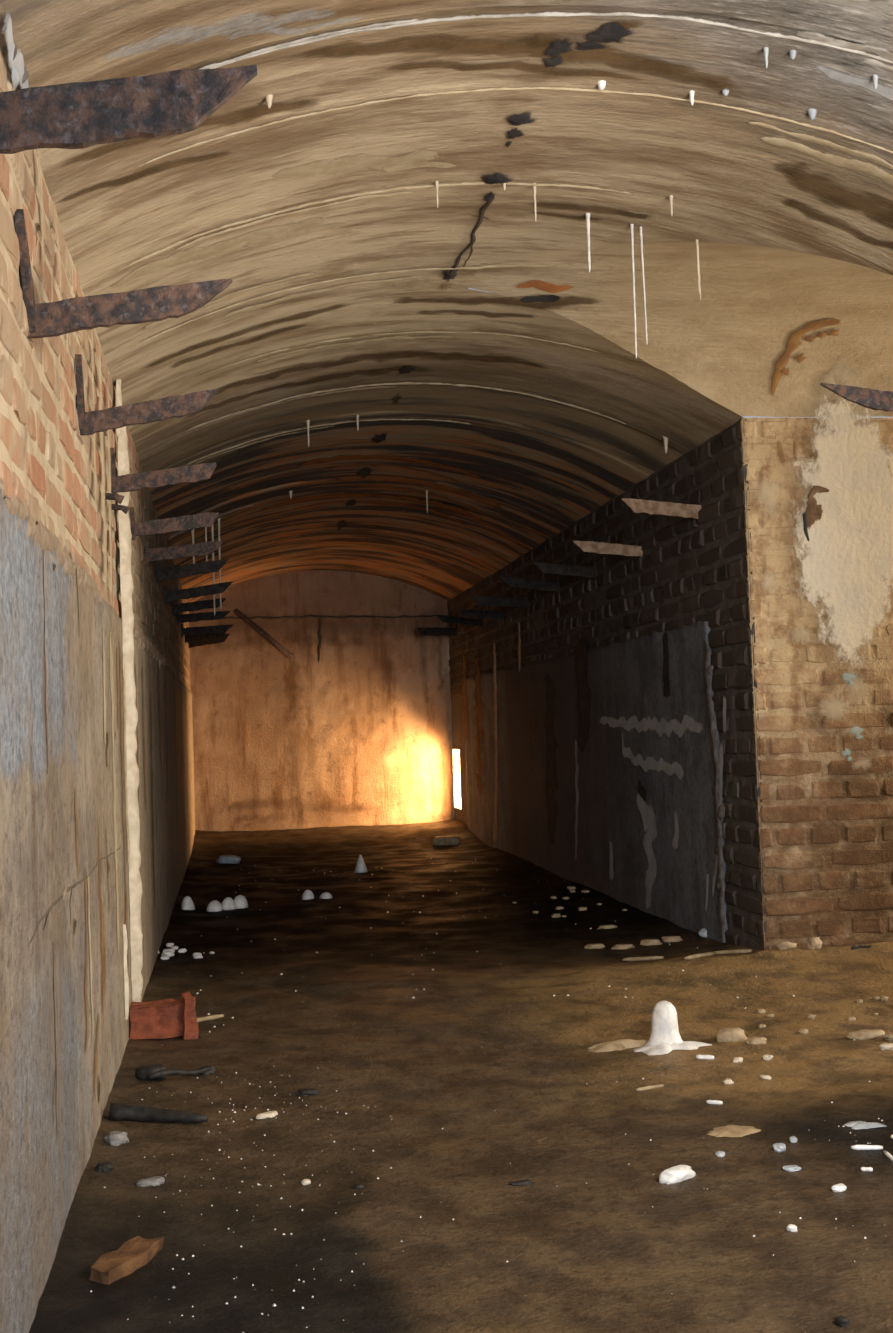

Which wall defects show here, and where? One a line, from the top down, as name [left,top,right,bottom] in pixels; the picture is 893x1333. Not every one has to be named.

water stain [92,329,122,411]
water stain [38,11,893,292]
crack [451,192,494,271]
peeling [793,366,893,719]
water stain [94,426,143,1020]